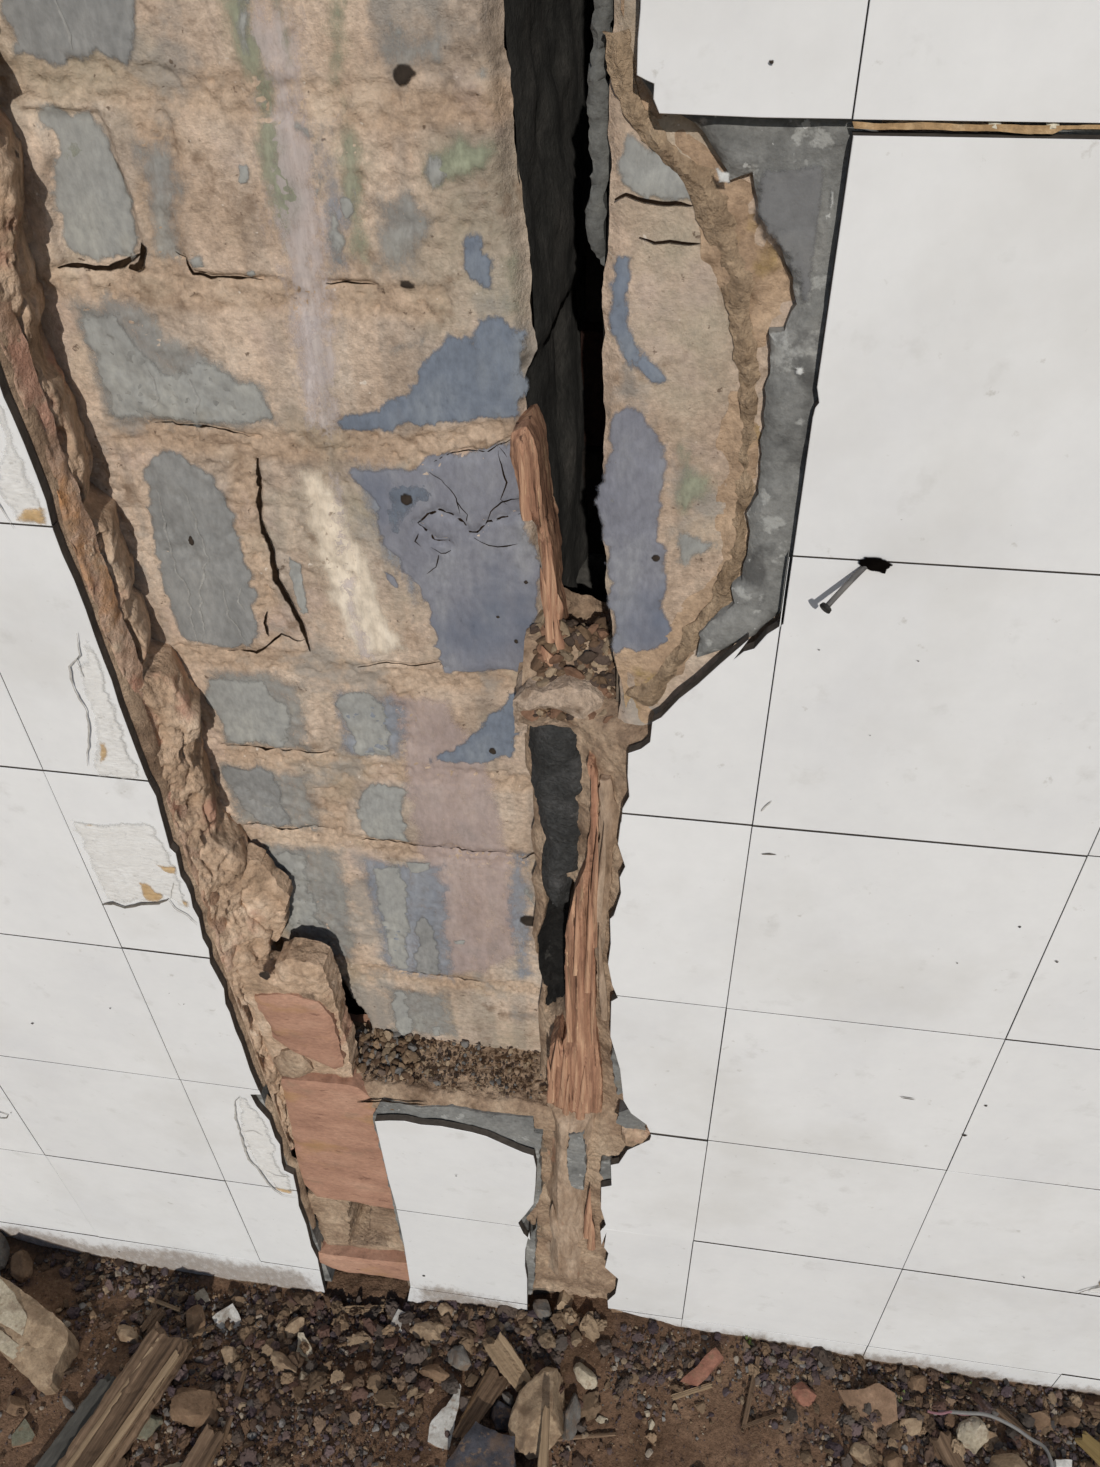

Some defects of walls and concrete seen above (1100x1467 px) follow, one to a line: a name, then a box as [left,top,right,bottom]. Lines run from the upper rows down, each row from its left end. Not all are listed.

spalling [393,64,416,85]
spalling [716,168,729,182]
crack [57,243,263,280]
crack [326,278,372,286]
crack [615,193,701,245]
spalling [758,166,833,300]
crack [155,421,310,654]
crack [414,440,519,574]
spalling [74,822,192,921]
spalling [520,889,571,1006]
peeling [611,1046,646,1130]
spalling [306,1186,405,1251]